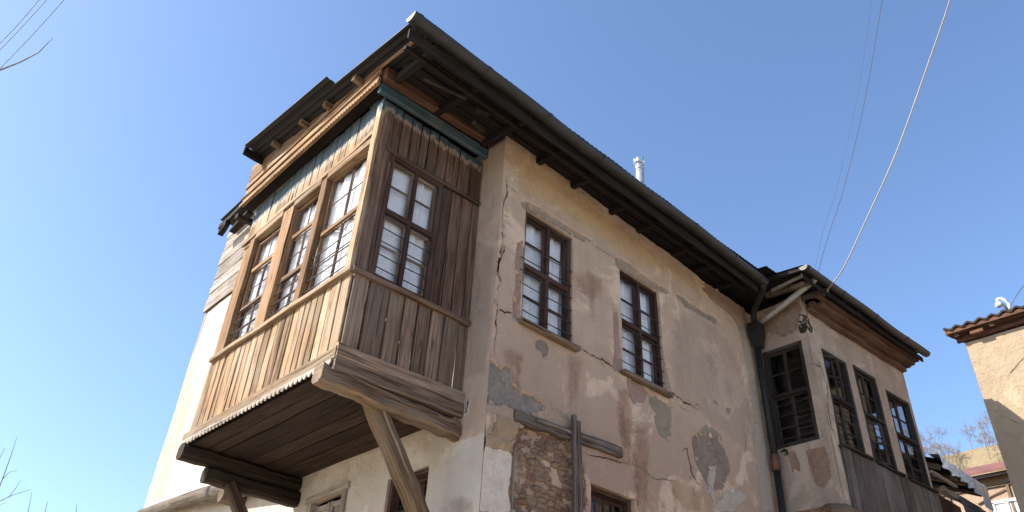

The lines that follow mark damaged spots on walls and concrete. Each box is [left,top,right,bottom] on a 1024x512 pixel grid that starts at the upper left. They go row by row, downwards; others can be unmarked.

crack [470,175,516,356]
spalling [487,361,590,512]
crack [581,348,616,370]
spalling [613,308,674,441]
crack [666,389,702,412]
spalling [692,433,749,512]